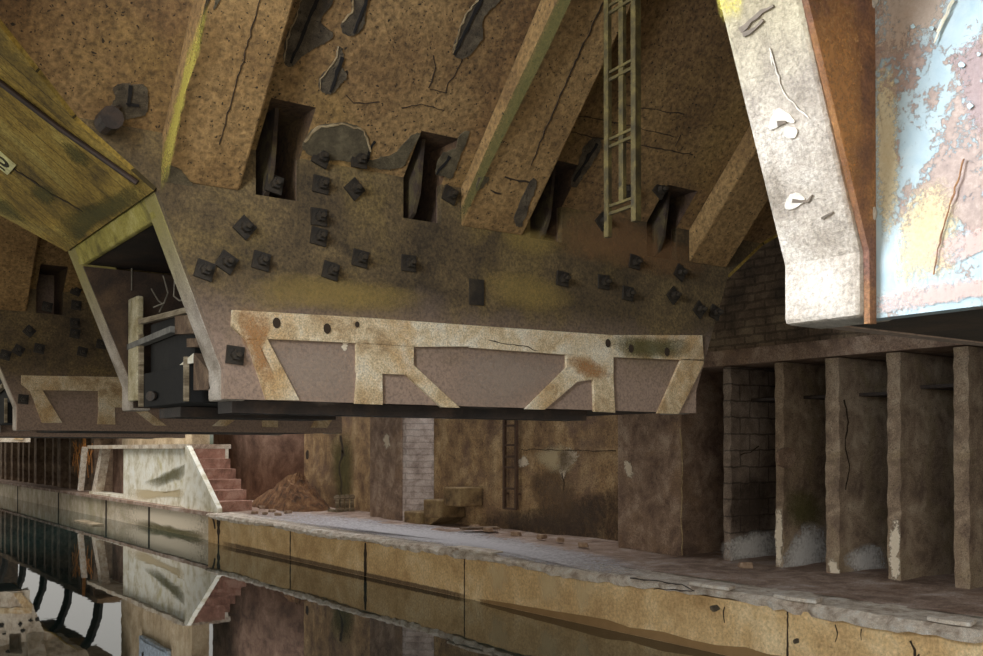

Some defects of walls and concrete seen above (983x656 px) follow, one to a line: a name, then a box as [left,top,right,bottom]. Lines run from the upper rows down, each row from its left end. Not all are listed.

crack [219,0,260,145]
spalling [283,0,368,95]
spalling [453,0,501,59]
crack [490,2,693,195]
rust [812,10,859,183]
spalling [302,122,420,170]
peeling [875,70,983,312]
rust [575,360,602,376]
crack [842,400,850,490]
damp [486,473,618,540]
damp [726,480,826,568]
damp [847,546,885,571]